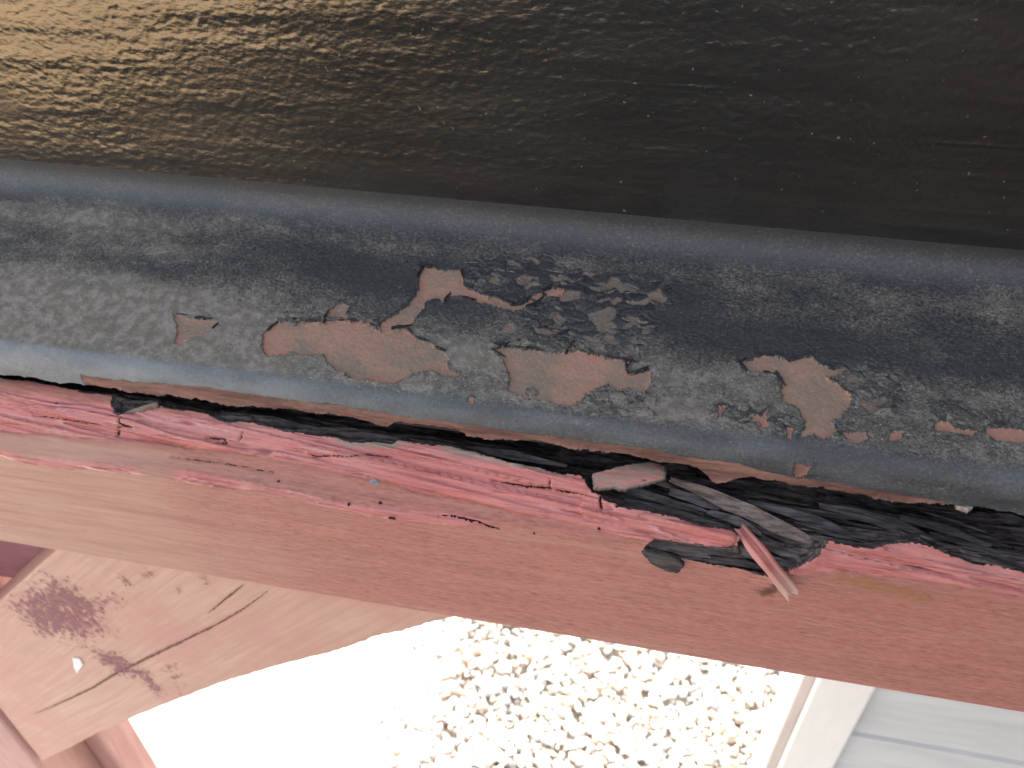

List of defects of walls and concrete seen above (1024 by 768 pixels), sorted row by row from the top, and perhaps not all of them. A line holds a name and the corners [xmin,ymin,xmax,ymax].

peeling [173,313,222,347]
peeling [262,245,675,418]
peeling [705,351,906,444]
spalling [0,375,1024,577]
leakage [8,571,160,699]
crack [34,584,268,714]